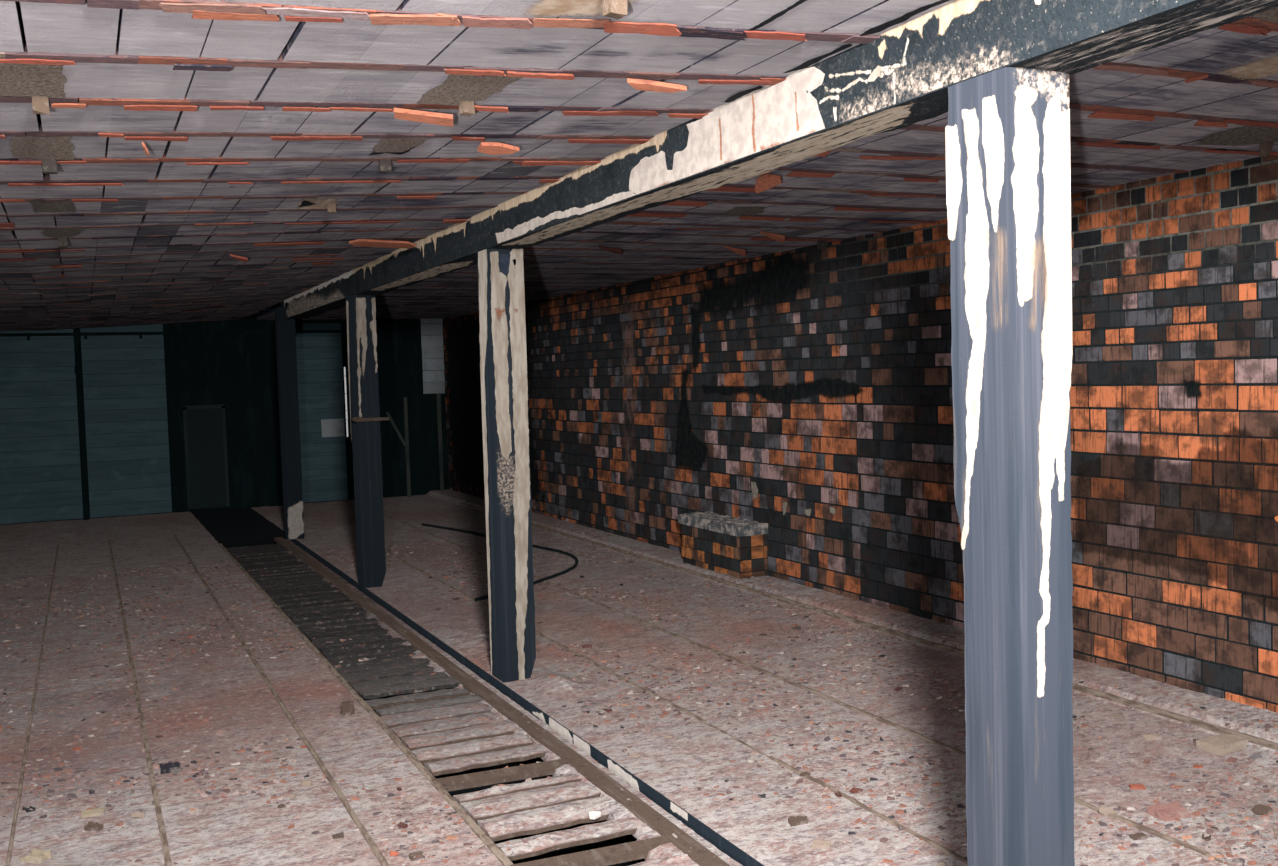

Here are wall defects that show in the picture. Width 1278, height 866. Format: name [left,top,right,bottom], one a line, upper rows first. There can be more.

peeling [160,0,807,41]
flaking render [0,58,86,108]
peeling [173,64,233,72]
flaking render [417,69,575,113]
peeling [98,133,188,141]
flaking render [270,136,469,163]
flaking render [487,0,1278,274]
leakage [283,130,667,307]
peeling [371,261,471,291]
leakage [346,297,378,421]
leakage [945,86,1073,698]
leakage [445,249,544,680]